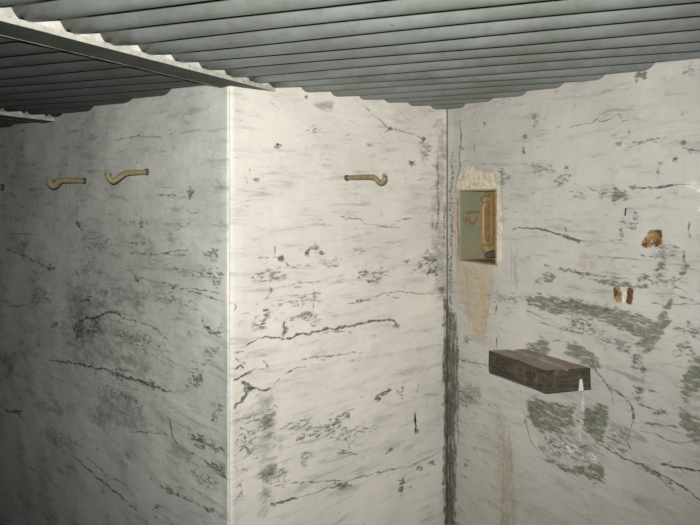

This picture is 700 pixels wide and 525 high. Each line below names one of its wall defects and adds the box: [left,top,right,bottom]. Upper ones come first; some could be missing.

rust [642,230,663,248]
rust [613,286,633,304]
crack [74,311,160,339]
crack [246,319,399,346]
water stain [432,152,491,525]